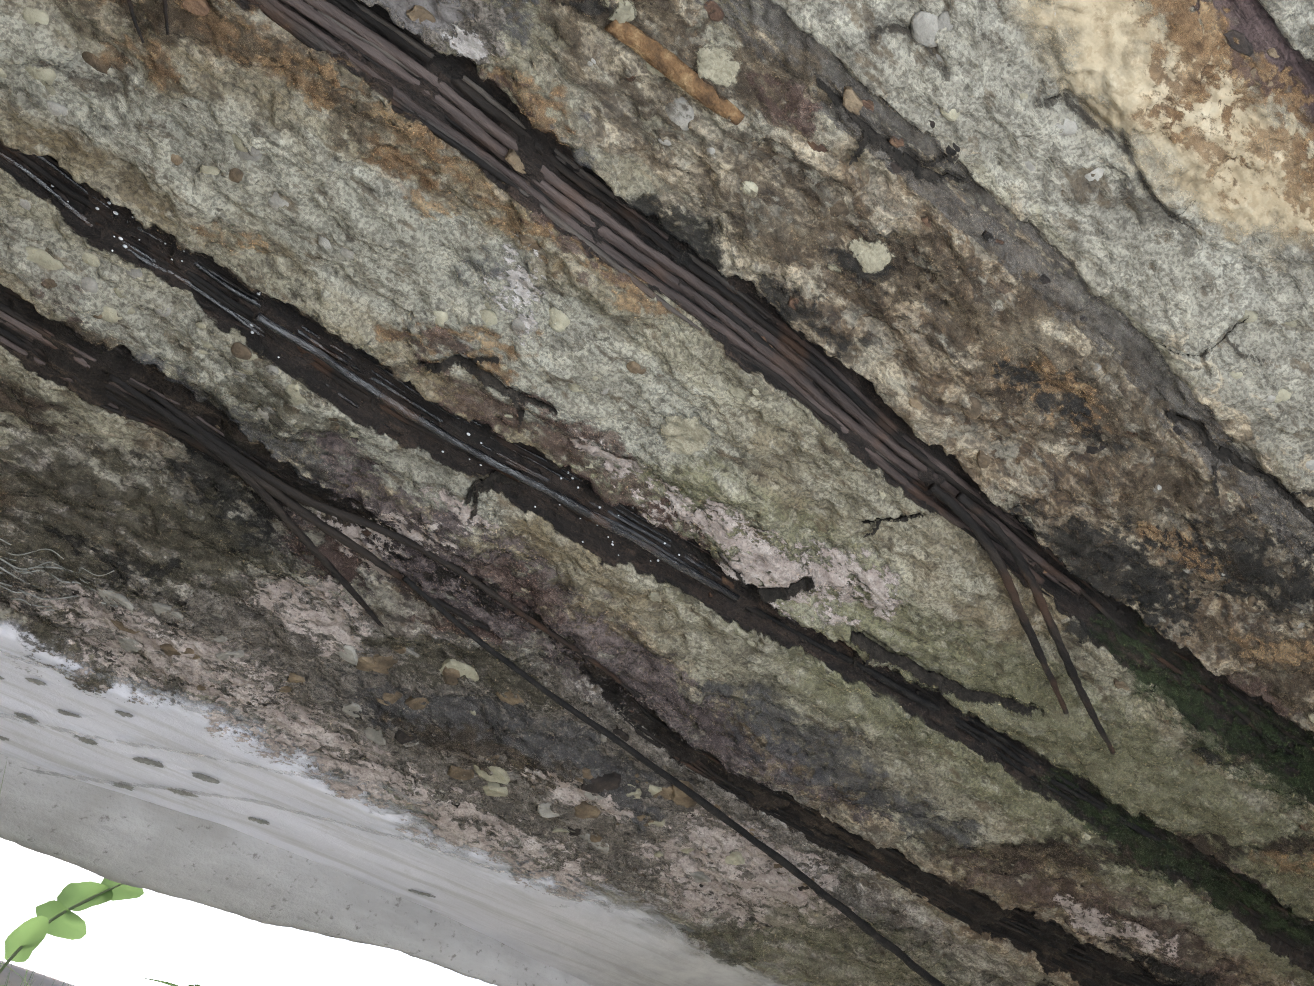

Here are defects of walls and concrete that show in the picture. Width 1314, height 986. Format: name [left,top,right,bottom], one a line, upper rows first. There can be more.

spalling [359,0,520,72]
peeling [696,1,742,87]
corrosion [155,0,681,328]
spalling [593,172,880,359]
peeling [846,236,894,274]
crack [1034,93,1196,230]
damp [0,377,302,608]
damp [304,483,501,578]
crack [417,354,558,428]
corrosion [374,319,719,563]
damp [698,171,1314,733]
corrosion [242,463,904,830]